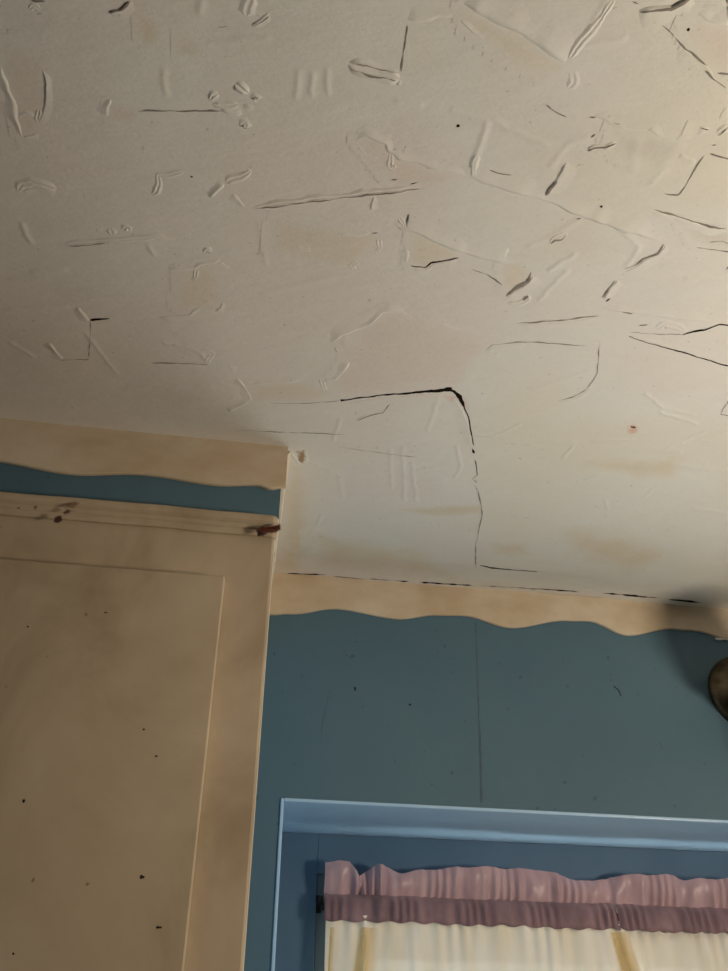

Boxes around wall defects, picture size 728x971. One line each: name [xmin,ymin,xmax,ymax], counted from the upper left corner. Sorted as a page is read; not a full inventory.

crack [259,188,424,209]
crack [488,302,728,403]
crack [239,387,577,592]
rust [256,524,281,536]
crack [604,593,702,603]